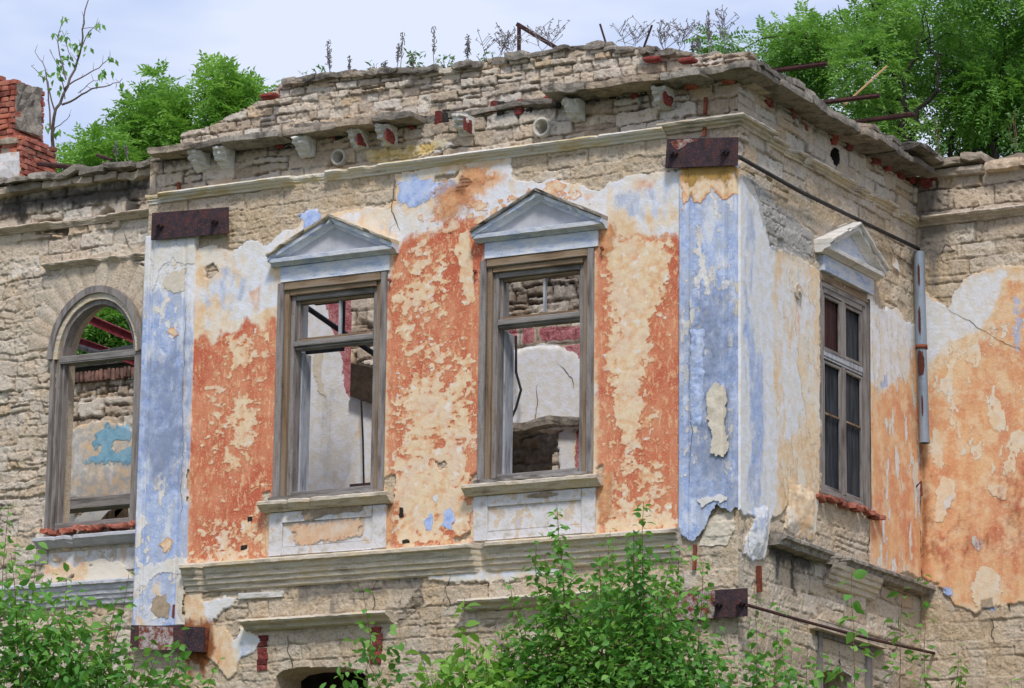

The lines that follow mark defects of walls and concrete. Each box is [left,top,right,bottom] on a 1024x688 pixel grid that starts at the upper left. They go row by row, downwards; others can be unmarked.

peeling [134,133,738,688]
flaking render [801,222,1024,641]